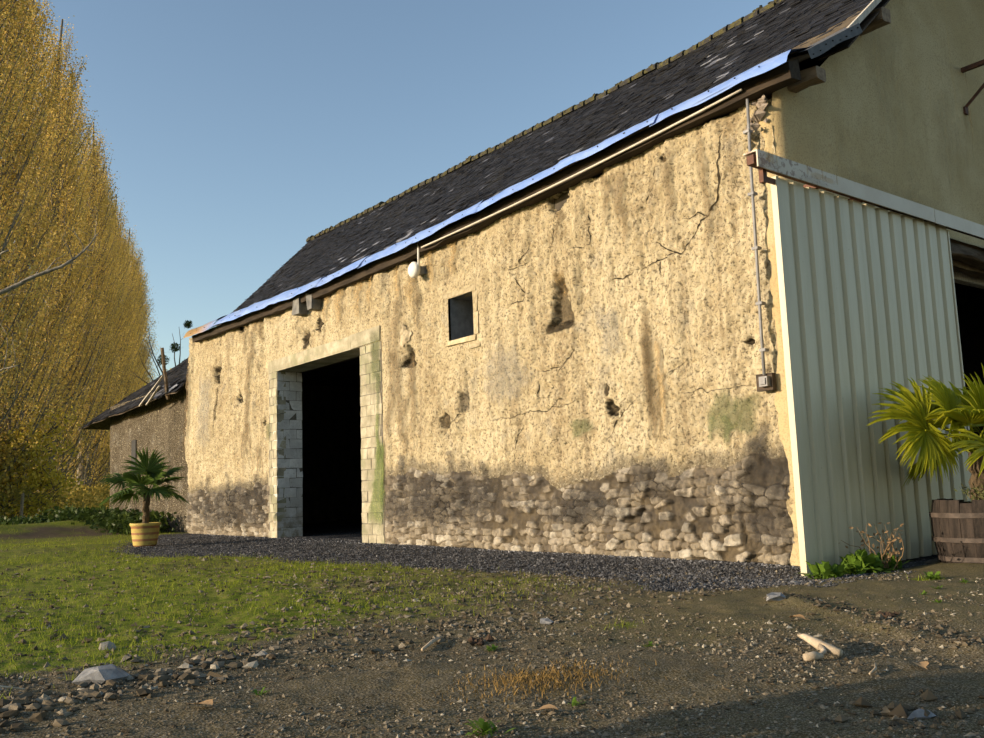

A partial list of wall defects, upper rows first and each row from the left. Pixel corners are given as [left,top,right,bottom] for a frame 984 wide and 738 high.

crack [609,133,725,281]
spalling [545,274,575,334]
peeling [398,324,417,371]
spalling [604,384,622,421]
leakage [376,414,384,496]